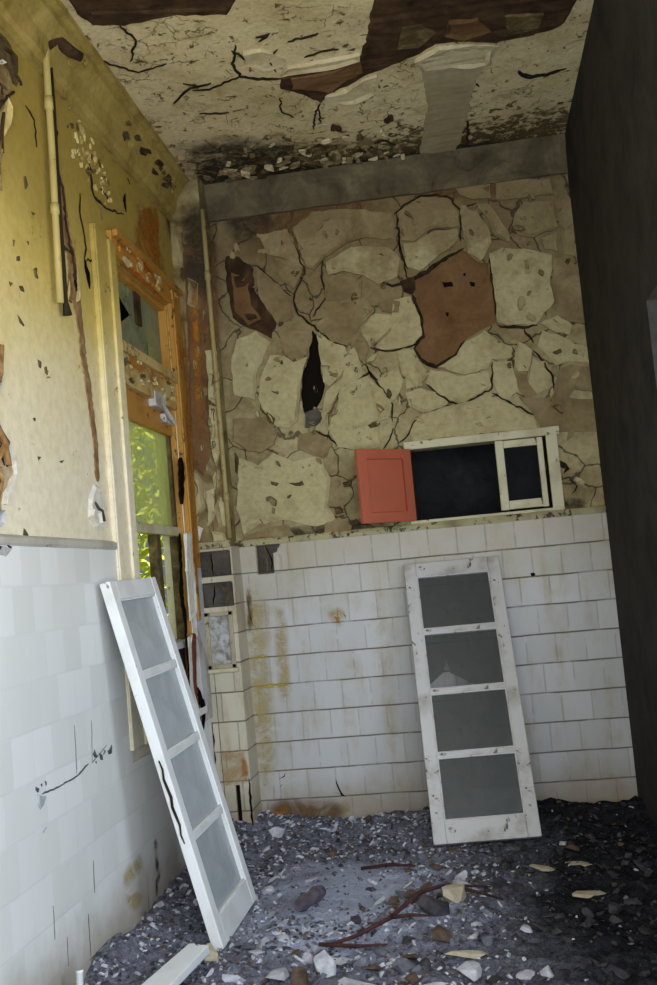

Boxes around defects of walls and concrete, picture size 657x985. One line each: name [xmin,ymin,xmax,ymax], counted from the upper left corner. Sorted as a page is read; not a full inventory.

crack [103,25,166,73]
flaking render [69,0,236,26]
crack [173,33,339,129]
flaking render [243,0,577,111]
crack [518,68,566,79]
peeling [122,115,408,193]
crack [256,228,347,347]
crack [382,194,476,287]
crack [357,324,555,449]
flaking render [0,425,14,527]
peeling [118,178,597,730]
crack [35,720,112,832]